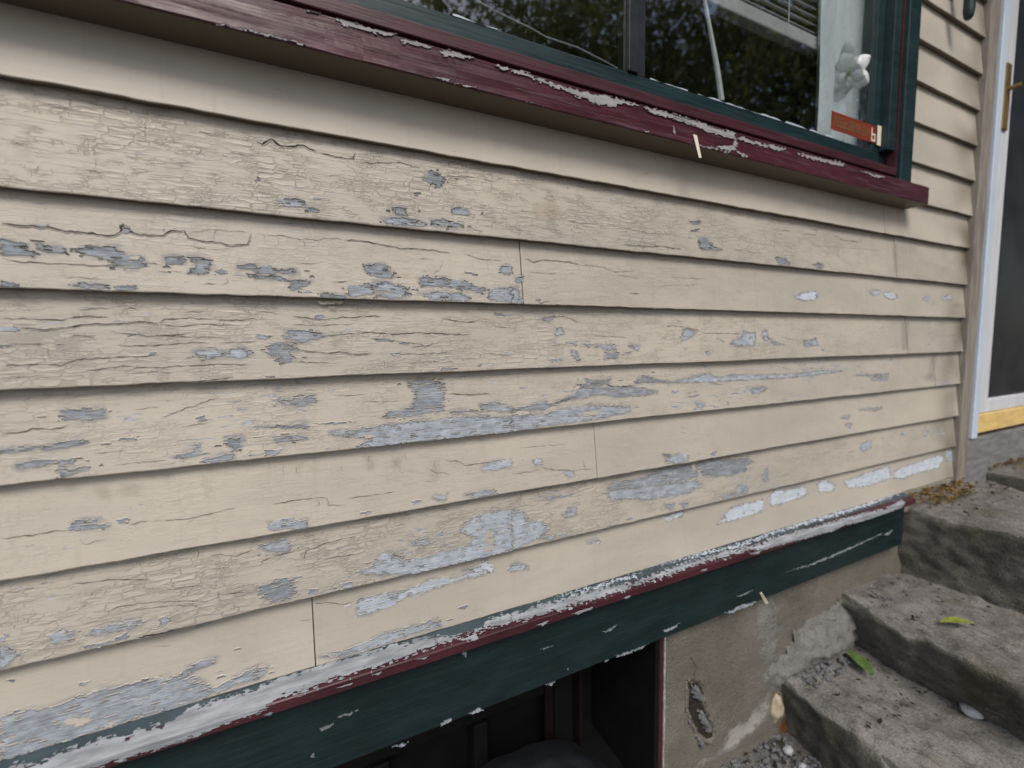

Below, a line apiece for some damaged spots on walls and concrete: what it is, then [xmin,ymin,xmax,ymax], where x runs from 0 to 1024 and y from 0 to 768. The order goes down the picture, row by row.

peeling [335,17,475,60]
crack [200,132,420,178]
peeling [495,64,845,167]
peeling [0,223,147,270]
peeling [68,281,138,291]
crack [1,210,682,295]
peeling [162,255,541,378]
peeling [379,207,484,230]
peeling [254,367,842,456]
peeling [604,450,952,524]
crack [69,562,250,649]
peeling [0,492,905,768]